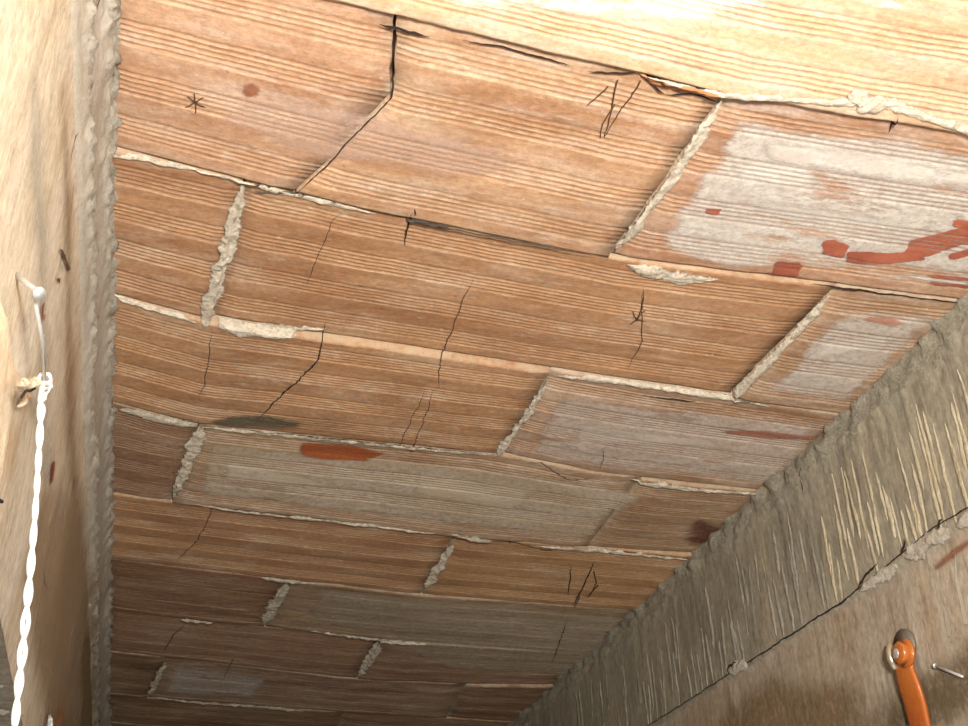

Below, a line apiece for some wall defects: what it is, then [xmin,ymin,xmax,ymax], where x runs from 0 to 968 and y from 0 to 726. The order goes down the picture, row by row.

efflorescence [454,0,772,27]
efflorescence [862,0,911,9]
crack [255,24,427,197]
crack [463,40,719,103]
crack [379,210,592,256]
efflorescence [664,122,968,285]
crack [627,288,644,369]
damp [771,313,933,398]
crack [818,284,958,303]
damp [537,369,968,726]
damp [311,590,623,674]
crack [647,507,968,726]